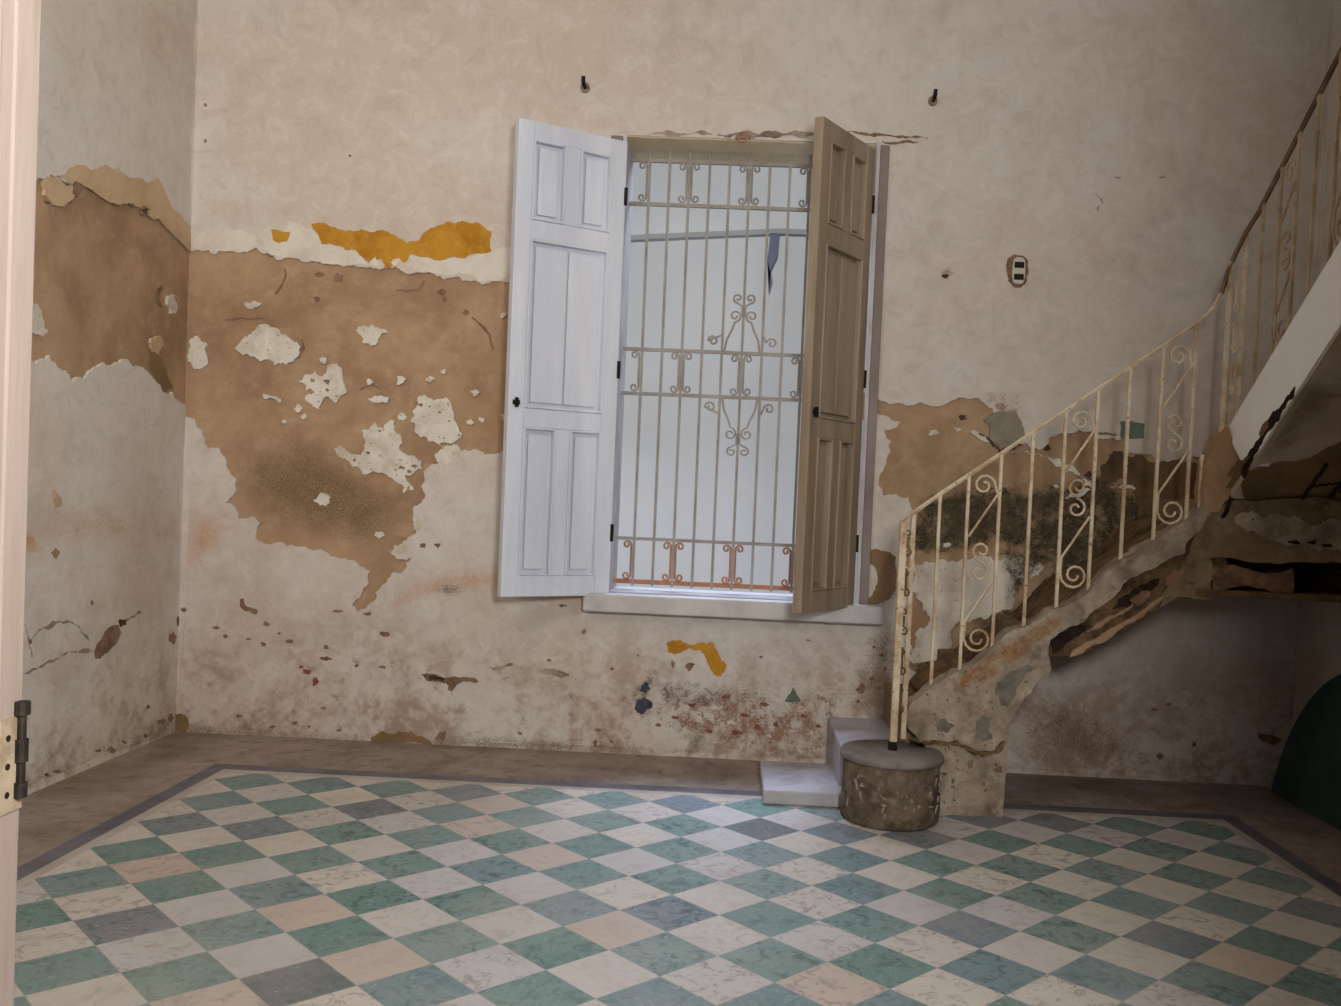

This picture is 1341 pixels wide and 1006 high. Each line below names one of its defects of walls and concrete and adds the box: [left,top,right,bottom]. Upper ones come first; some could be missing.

flaking render [32,164,511,616]
spalling [1205,387,1341,560]
flaking render [862,393,1199,673]
crack [23,620,90,674]
flaking render [94,619,126,659]
flaking render [240,598,293,646]
flaking render [298,645,332,686]
flaking render [421,673,480,692]
flaking render [630,640,838,757]
flaking render [855,645,887,703]